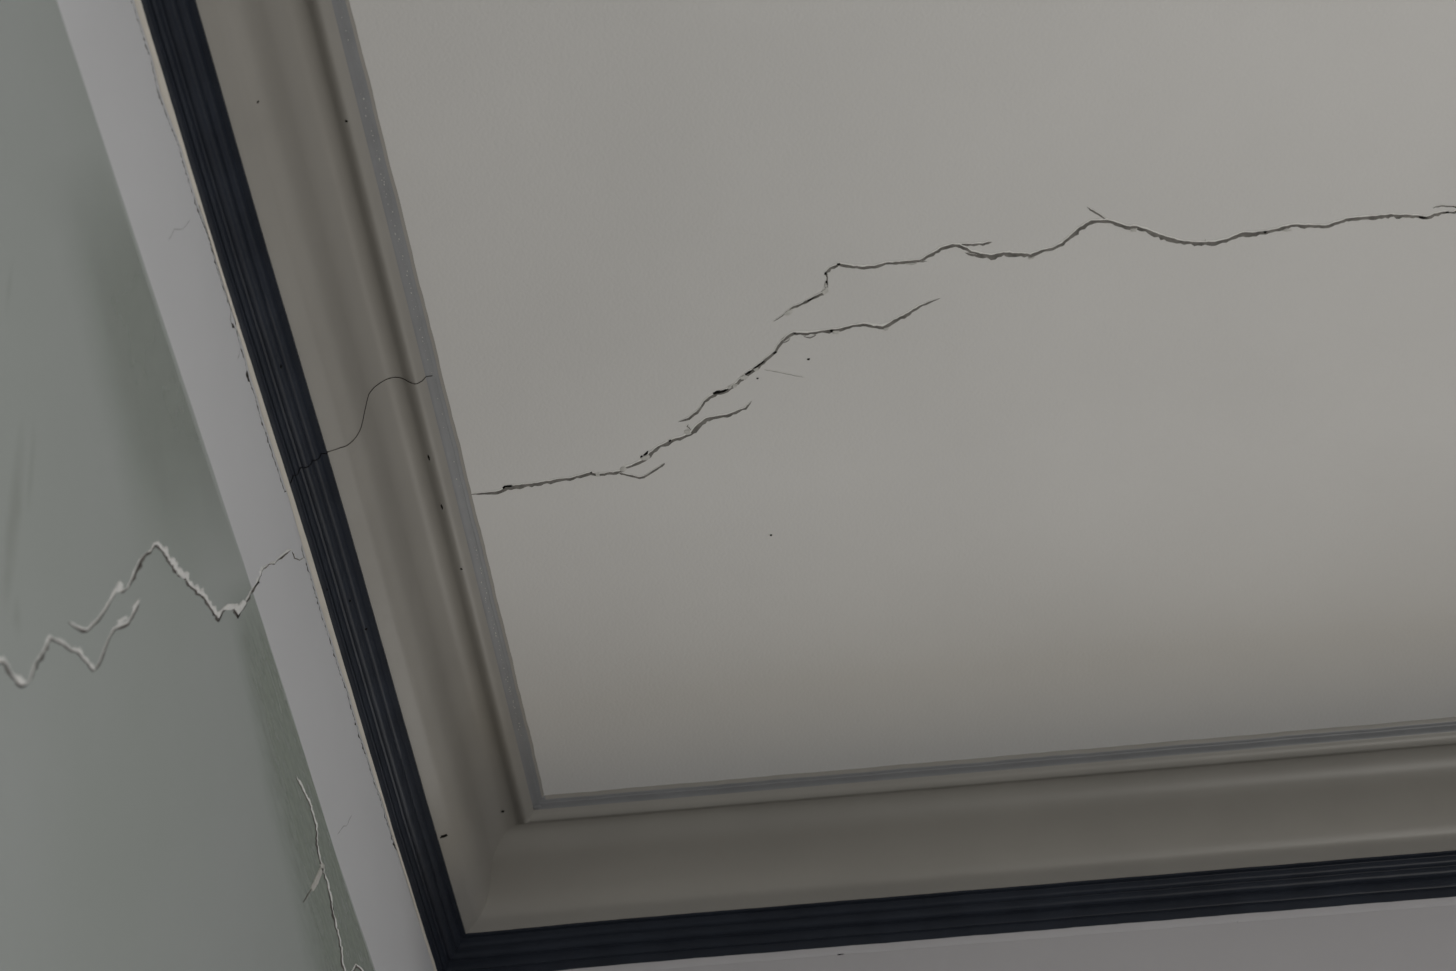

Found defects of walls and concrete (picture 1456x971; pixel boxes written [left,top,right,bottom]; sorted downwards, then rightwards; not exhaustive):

crack [471,205,1456,495]
crack [0,541,397,971]